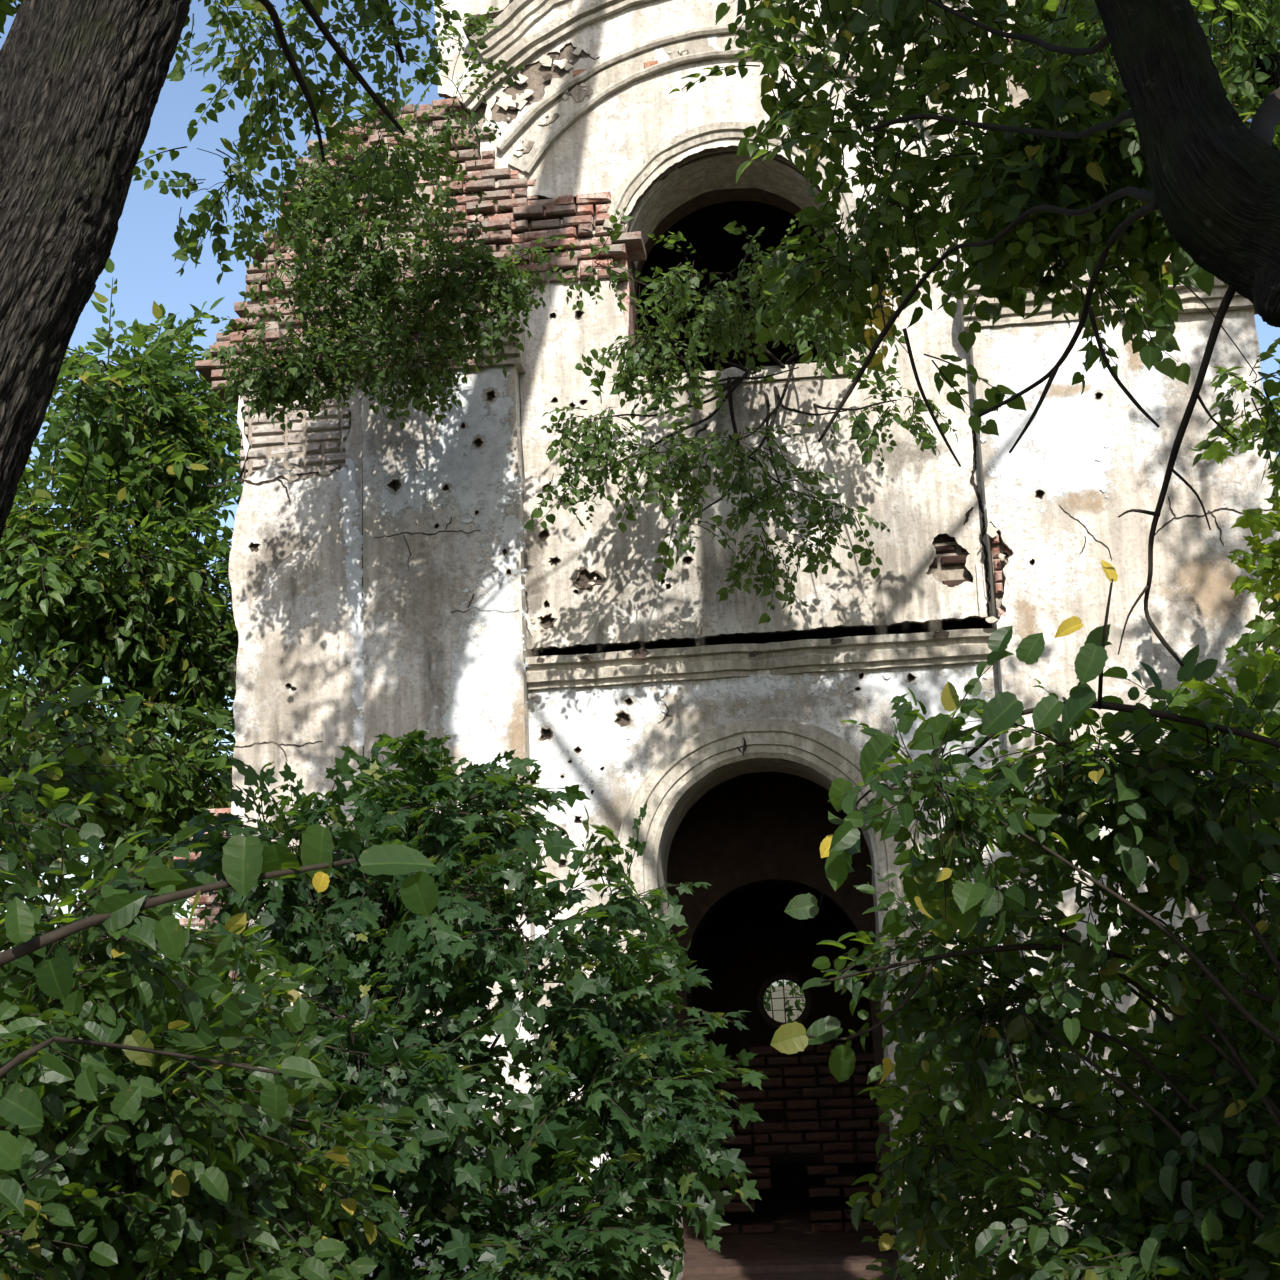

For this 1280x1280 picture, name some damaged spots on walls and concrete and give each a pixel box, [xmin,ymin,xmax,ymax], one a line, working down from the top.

flaking render [484,43,612,126]
flaking render [415,139,614,280]
crack [374,516,481,571]
peeling [240,365,1000,826]
crack [963,430,991,617]
peeling [980,317,1186,623]